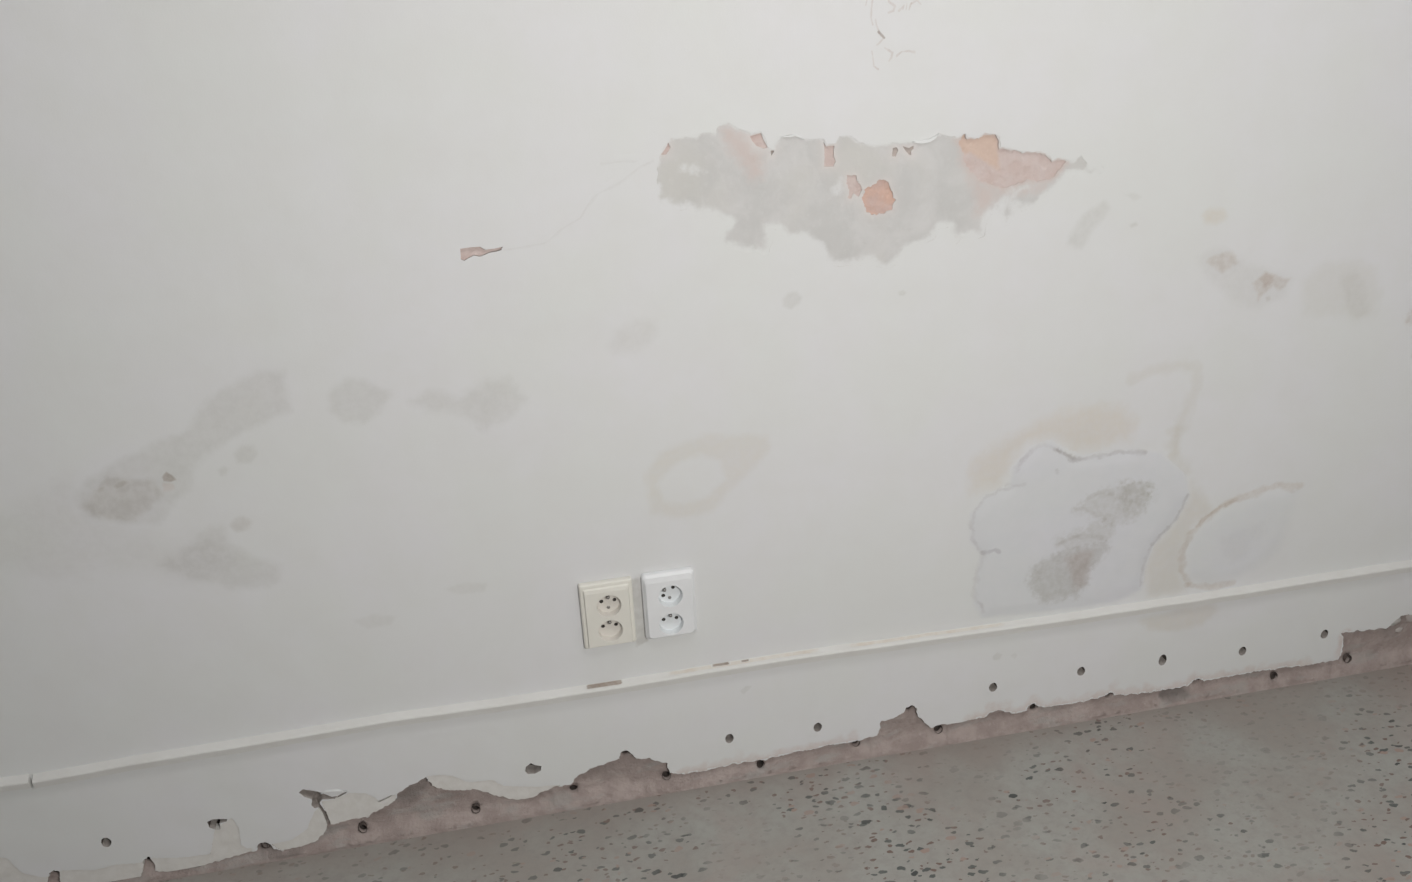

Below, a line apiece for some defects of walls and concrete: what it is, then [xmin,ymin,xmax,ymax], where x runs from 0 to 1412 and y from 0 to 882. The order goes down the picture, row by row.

peeling [460,247,502,260]
peeling [651,123,1105,270]
water stain [0,359,543,606]
flaking render [0,614,1412,882]